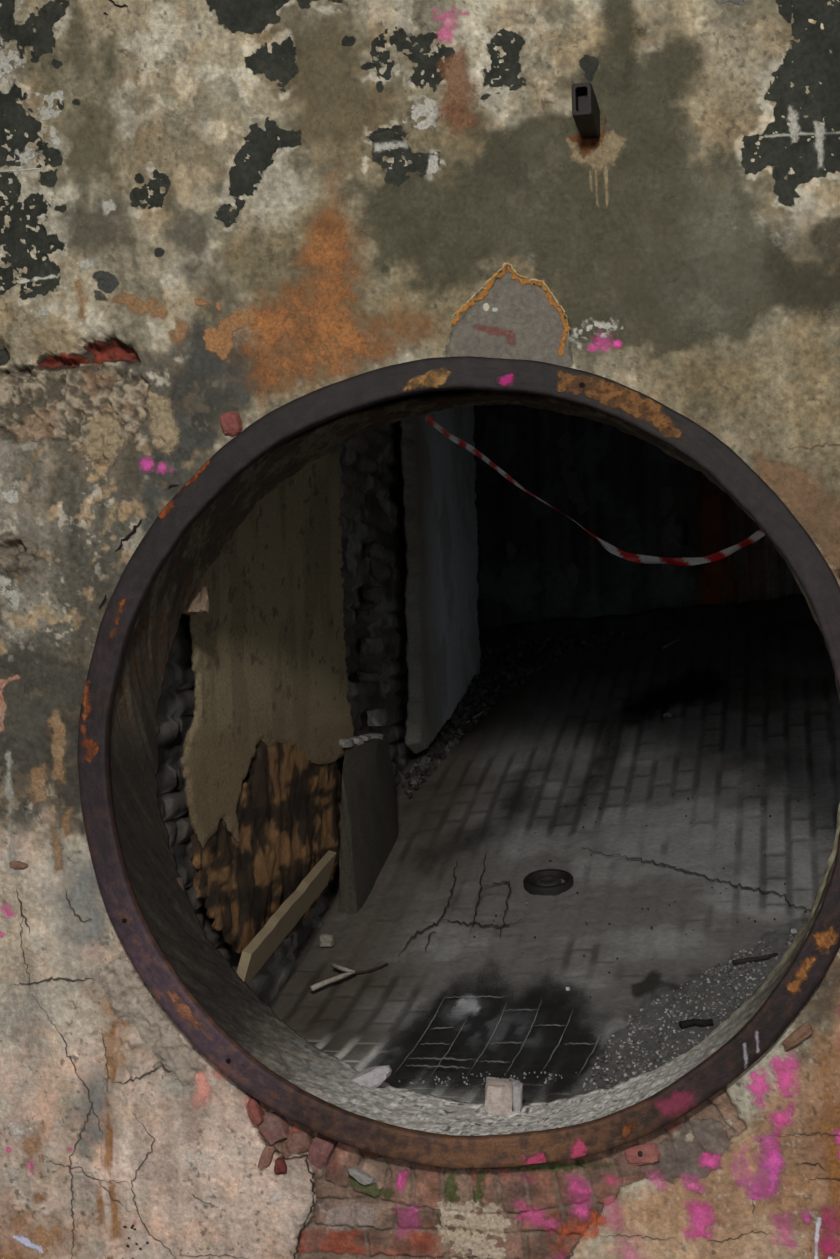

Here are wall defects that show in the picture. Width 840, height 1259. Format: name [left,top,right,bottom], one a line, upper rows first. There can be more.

peeling [0,0,80,315]
peeling [206,0,342,92]
water stain [347,0,840,351]
corrosion [566,130,626,207]
peeling [741,0,840,207]
corrosion [195,212,396,397]
crack [14,888,250,1259]
crack [398,852,524,957]
water stain [375,974,606,1102]
crack [582,847,811,911]
corrosion [787,926,836,993]
flaking render [247,1088,747,1259]